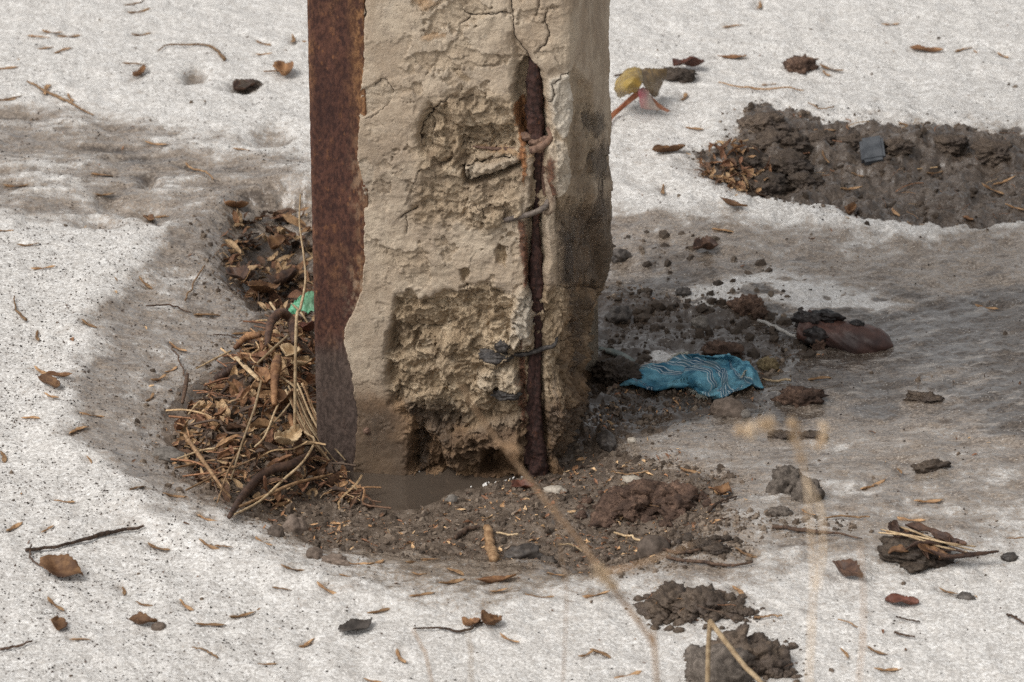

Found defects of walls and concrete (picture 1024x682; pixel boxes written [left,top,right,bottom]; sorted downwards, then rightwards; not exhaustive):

crack [462,0,550,55]
corrosion [514,95,527,182]
corrosion [545,158,556,197]
spalling [385,34,606,478]
corrosion [518,220,529,288]